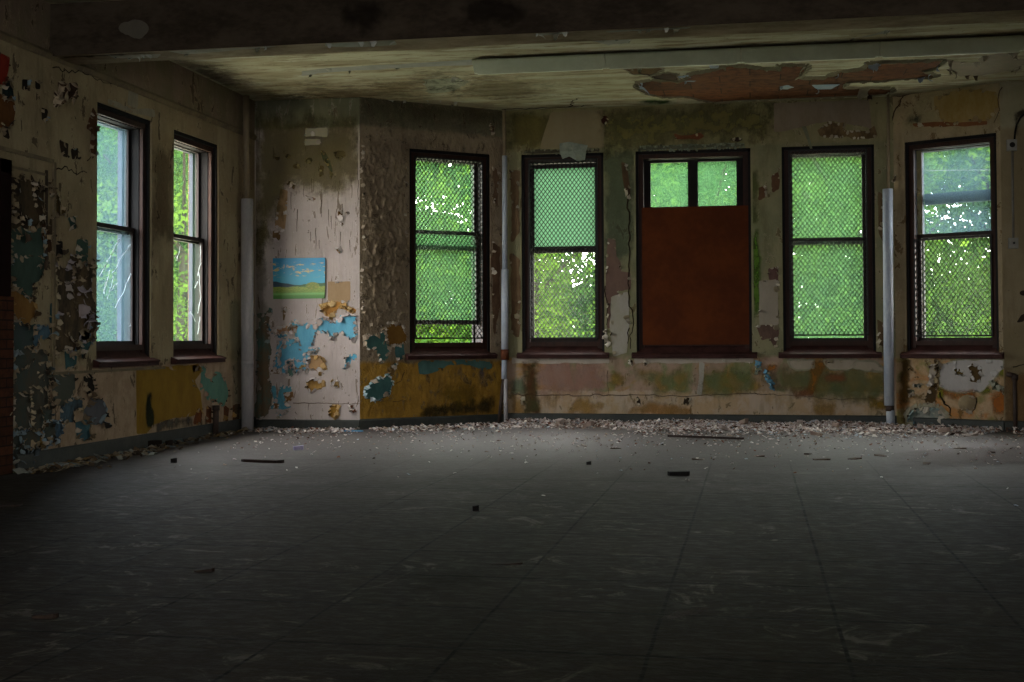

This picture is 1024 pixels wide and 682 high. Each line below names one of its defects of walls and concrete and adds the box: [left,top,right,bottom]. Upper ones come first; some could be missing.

peeling [59,108,101,160]
water stain [256,113,358,262]
water stain [604,102,775,265]
flaking render [623,58,948,104]
peeling [818,121,877,140]
peeling [10,173,112,466]
peeling [255,133,409,420]
peeling [512,238,775,406]
peeling [903,358,1005,425]